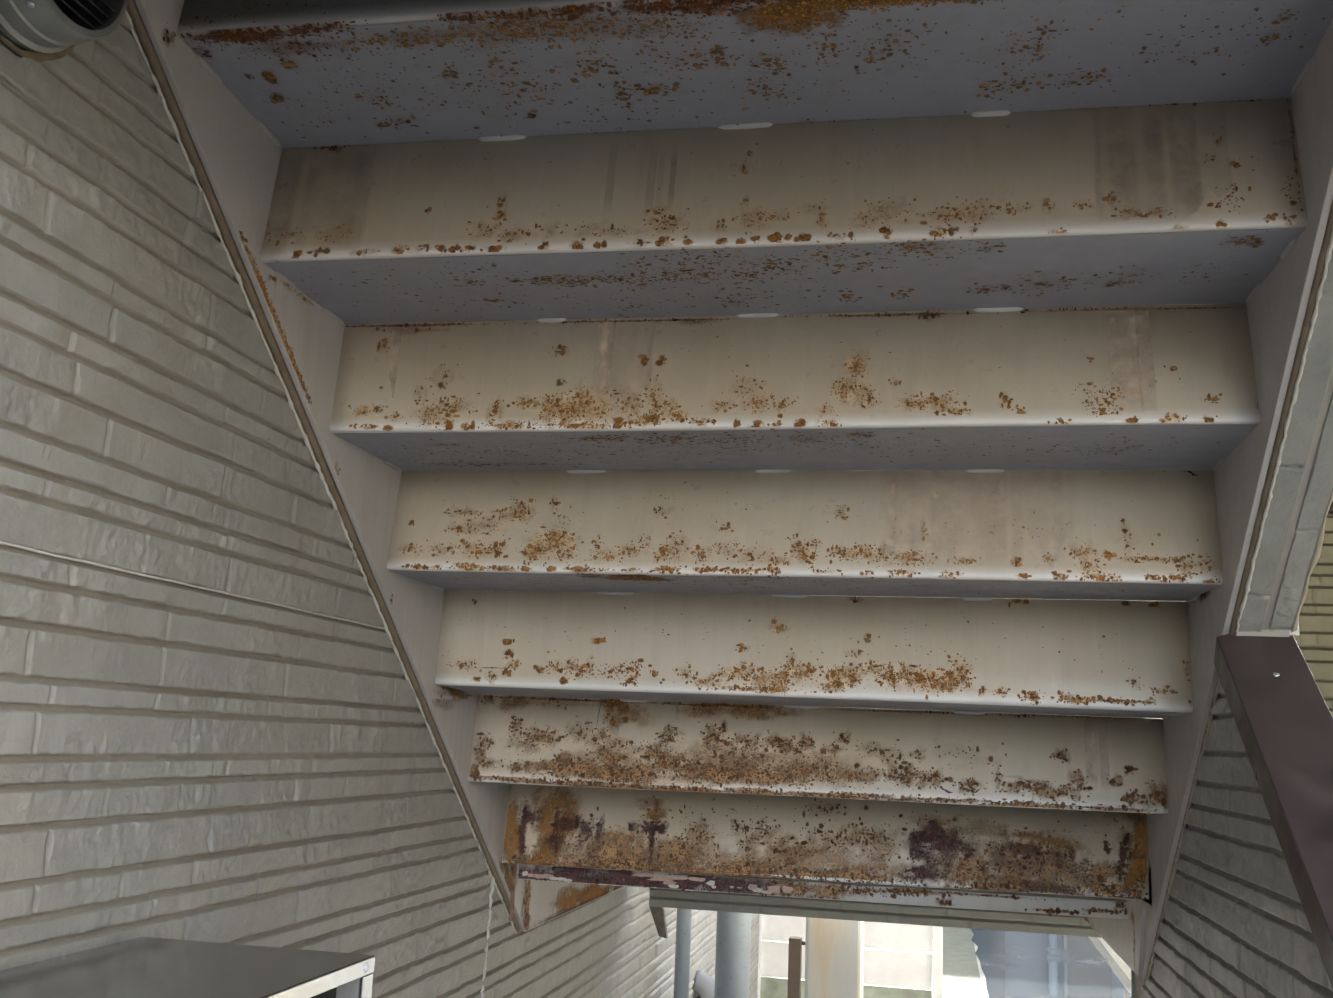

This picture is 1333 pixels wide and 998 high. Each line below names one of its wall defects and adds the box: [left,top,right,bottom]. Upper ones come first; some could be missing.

rust [152,0,1005,154]
rust [960,16,1130,109]
rust [1087,3,1306,76]
rust [1183,99,1303,283]
rust [239,196,1054,404]
rust [348,349,971,468]
rust [959,373,1144,467]
rust [1159,394,1222,451]
rust [1008,509,1220,607]
rust [438,620,1191,949]
peeling [522,871,572,883]
peeling [598,872,793,894]